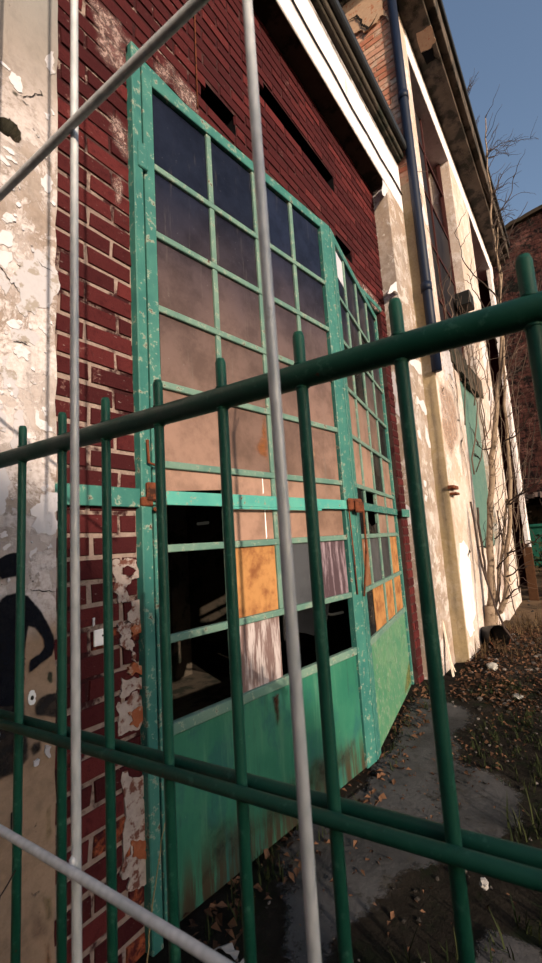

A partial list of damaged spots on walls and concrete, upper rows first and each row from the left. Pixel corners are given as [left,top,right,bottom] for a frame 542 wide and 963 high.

crack [349,15,376,30]
peeling [45,51,56,75]
peeling [0,61,23,93]
spalling [0,117,21,166]
peeling [40,174,56,206]
peeling [0,184,60,449]
spalling [127,662,142,675]
spalling [128,706,143,728]
spalling [131,840,146,859]